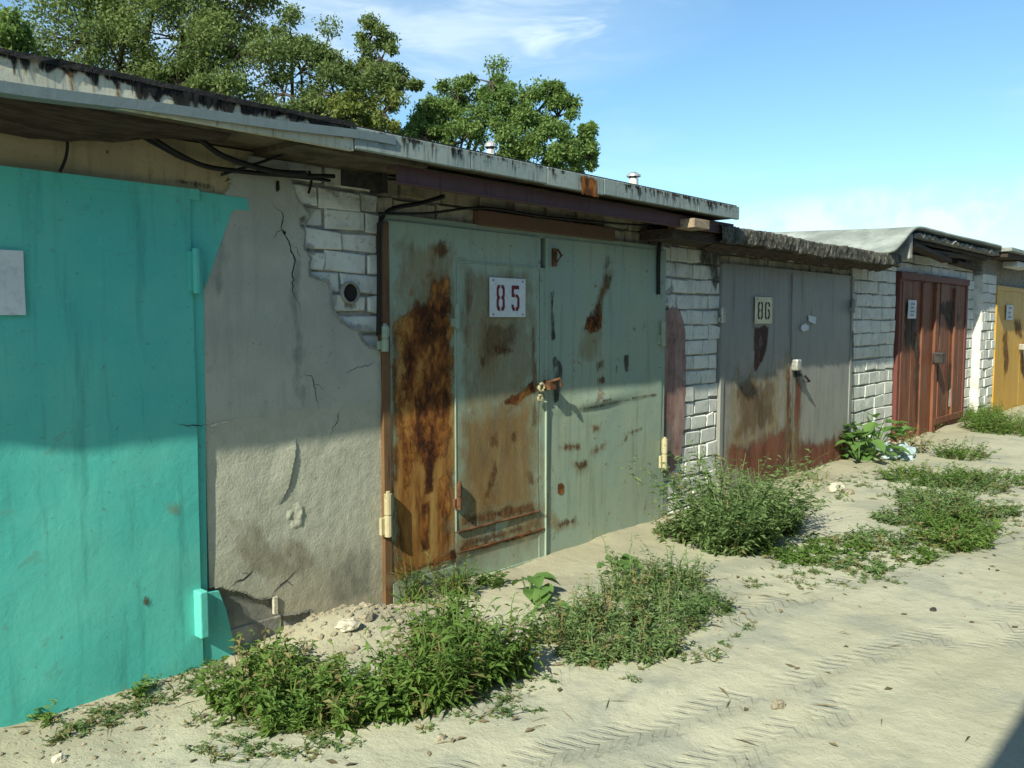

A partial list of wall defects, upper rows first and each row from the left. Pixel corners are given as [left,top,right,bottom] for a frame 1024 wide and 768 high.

damp [4,56,30,74]
damp [90,73,118,88]
damp [131,81,306,132]
corrosion [581,176,598,197]
crack [275,208,300,306]
flaking render [262,157,385,351]
corrosion [585,275,612,333]
corrosion [391,274,574,581]
corrosion [729,368,846,479]
flaking render [218,586,312,616]